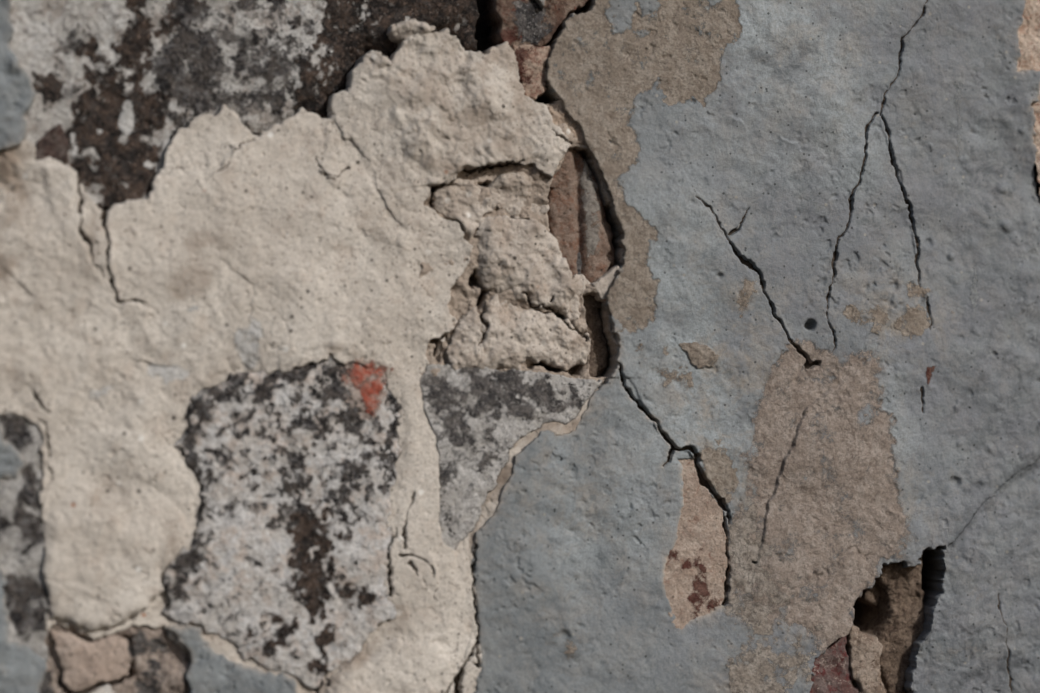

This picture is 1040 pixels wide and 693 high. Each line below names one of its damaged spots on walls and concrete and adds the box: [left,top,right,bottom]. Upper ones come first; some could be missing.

spalling [1017,0,1040,72]
crack [76,169,150,307]
crack [692,0,932,369]
spalling [1031,95,1040,194]
spalling [0,0,743,693]
crack [387,492,438,600]
crack [446,544,479,693]
crack [618,363,729,605]
peeling [664,338,940,693]